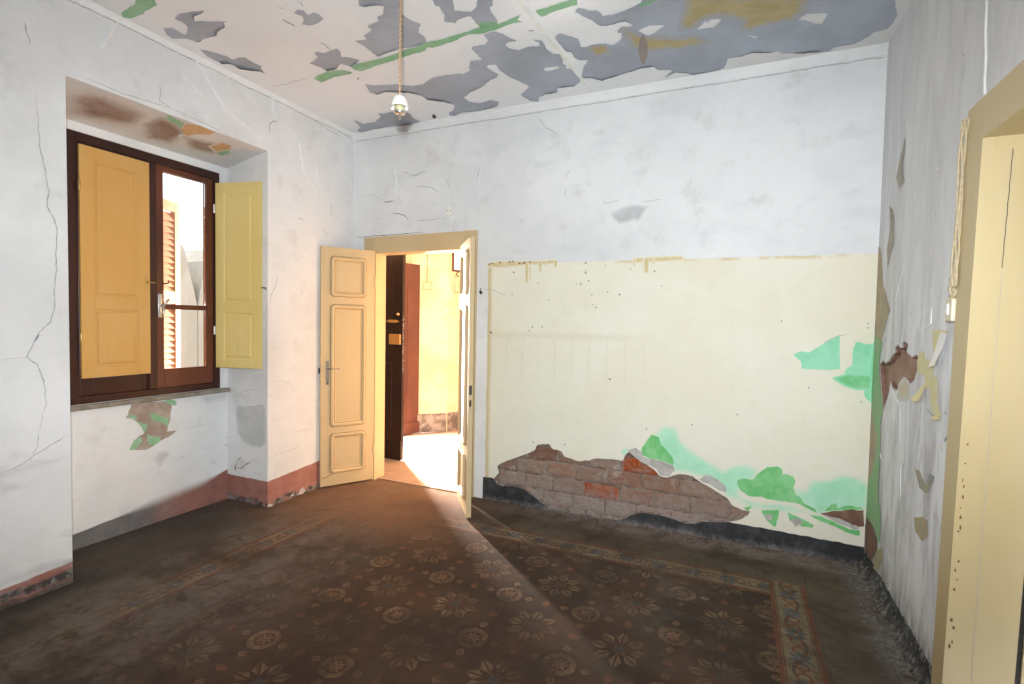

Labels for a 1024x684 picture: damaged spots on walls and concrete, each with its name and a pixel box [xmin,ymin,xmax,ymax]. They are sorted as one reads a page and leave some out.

damp [66,89,219,155]
peeling [354,112,420,133]
crack [69,0,884,150]
peeling [310,0,898,116]
crack [3,97,68,471]
spalling [494,139,948,571]
peeling [126,399,176,450]
damp [197,389,268,449]